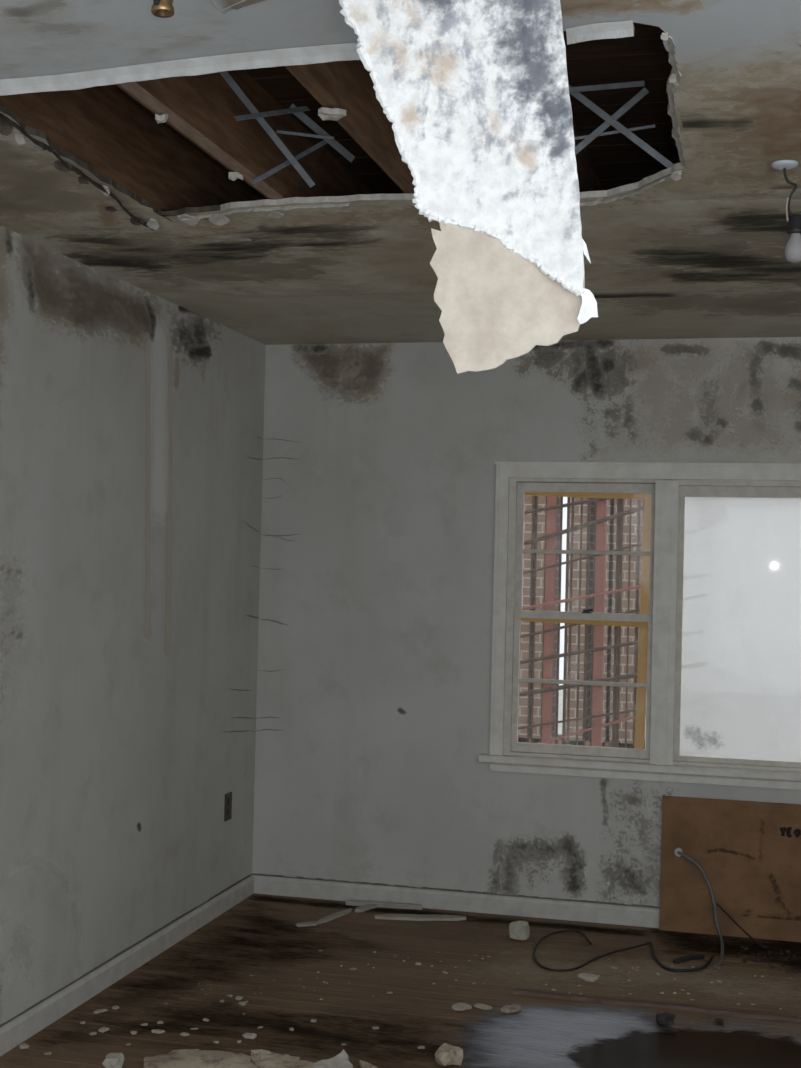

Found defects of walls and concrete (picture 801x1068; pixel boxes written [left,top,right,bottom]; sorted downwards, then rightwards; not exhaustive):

peeling [0,119,25,145]
leakage [679,79,801,195]
peeling [177,214,230,226]
leakage [594,208,801,316]
leakage [0,141,440,520]
leakage [517,340,664,440]
leakage [661,341,801,446]
leakage [490,834,586,897]
leakage [600,779,670,902]